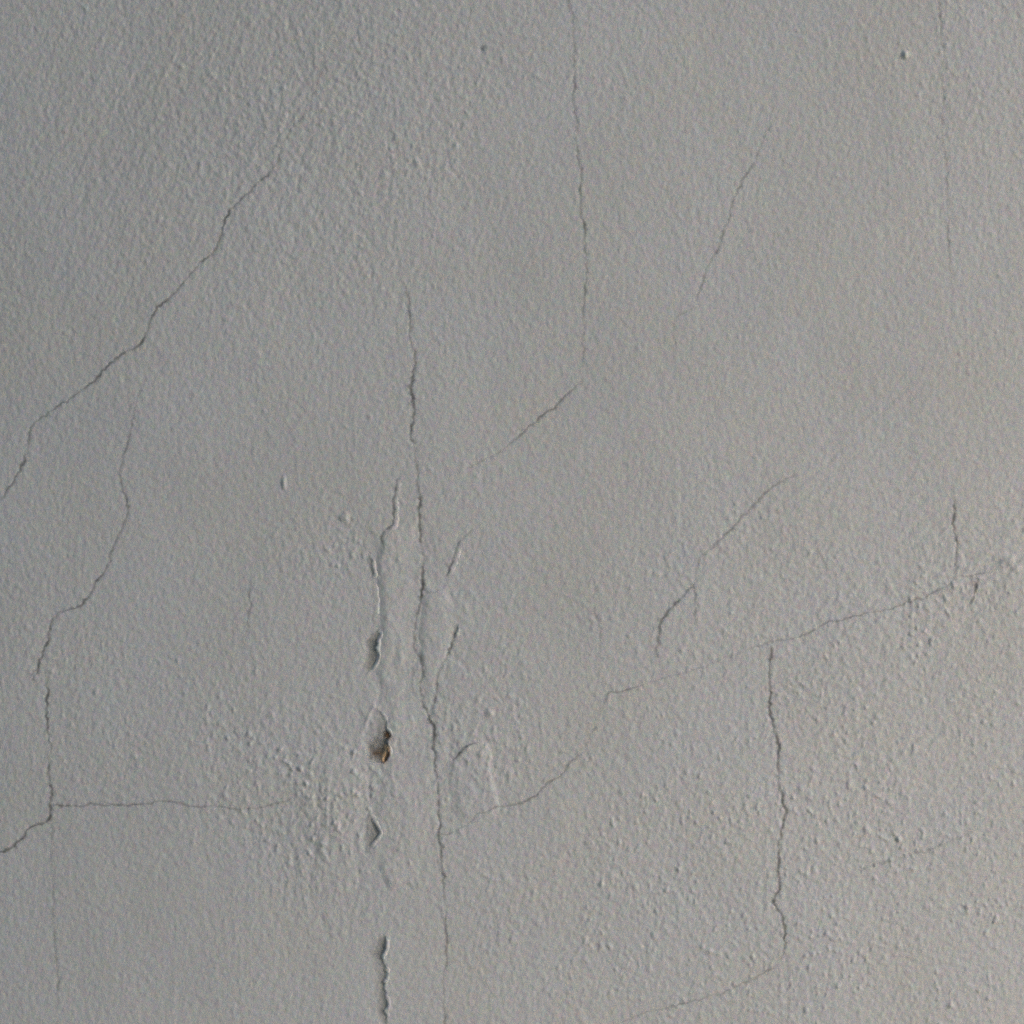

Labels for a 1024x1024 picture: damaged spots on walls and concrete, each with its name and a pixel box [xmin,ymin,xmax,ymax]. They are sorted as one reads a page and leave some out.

flaking render [370,556,383,670]
rust [373,733,390,763]